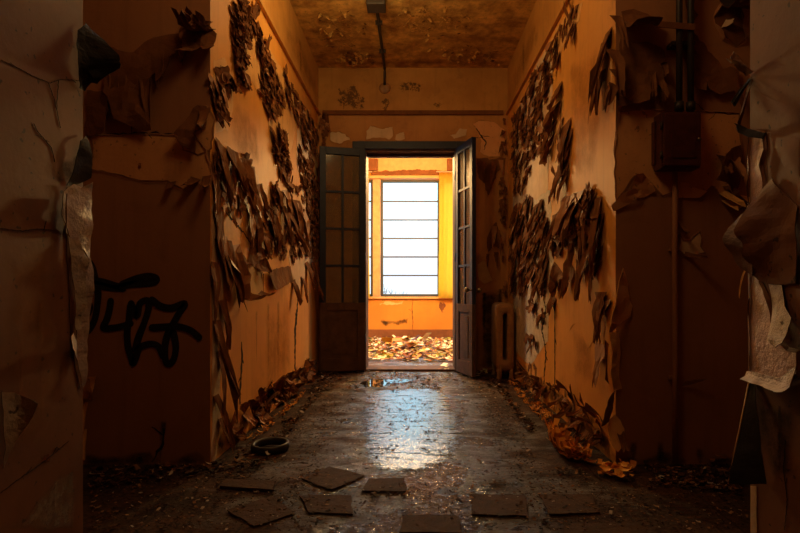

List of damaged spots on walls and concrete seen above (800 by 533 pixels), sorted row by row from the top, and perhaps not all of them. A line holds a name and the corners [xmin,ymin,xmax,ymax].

crack [1,60,79,162]
peeling [61,0,351,462]
peeling [365,125,406,141]
peeling [449,0,800,533]